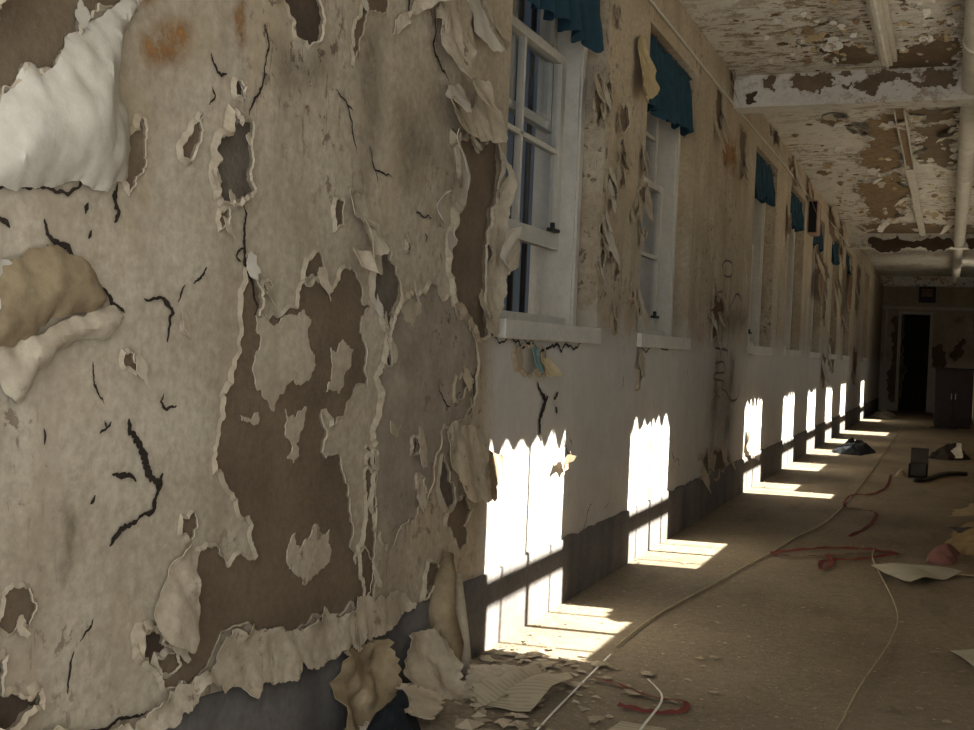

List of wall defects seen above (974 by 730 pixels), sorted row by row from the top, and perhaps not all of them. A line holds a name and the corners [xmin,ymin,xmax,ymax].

peeling [638,36,660,104]
peeling [769,106,974,403]
peeling [115,0,522,730]
crack [491,333,581,353]
spalling [511,340,563,379]
crack [92,363,163,546]
crack [160,394,177,411]
crack [537,382,572,455]